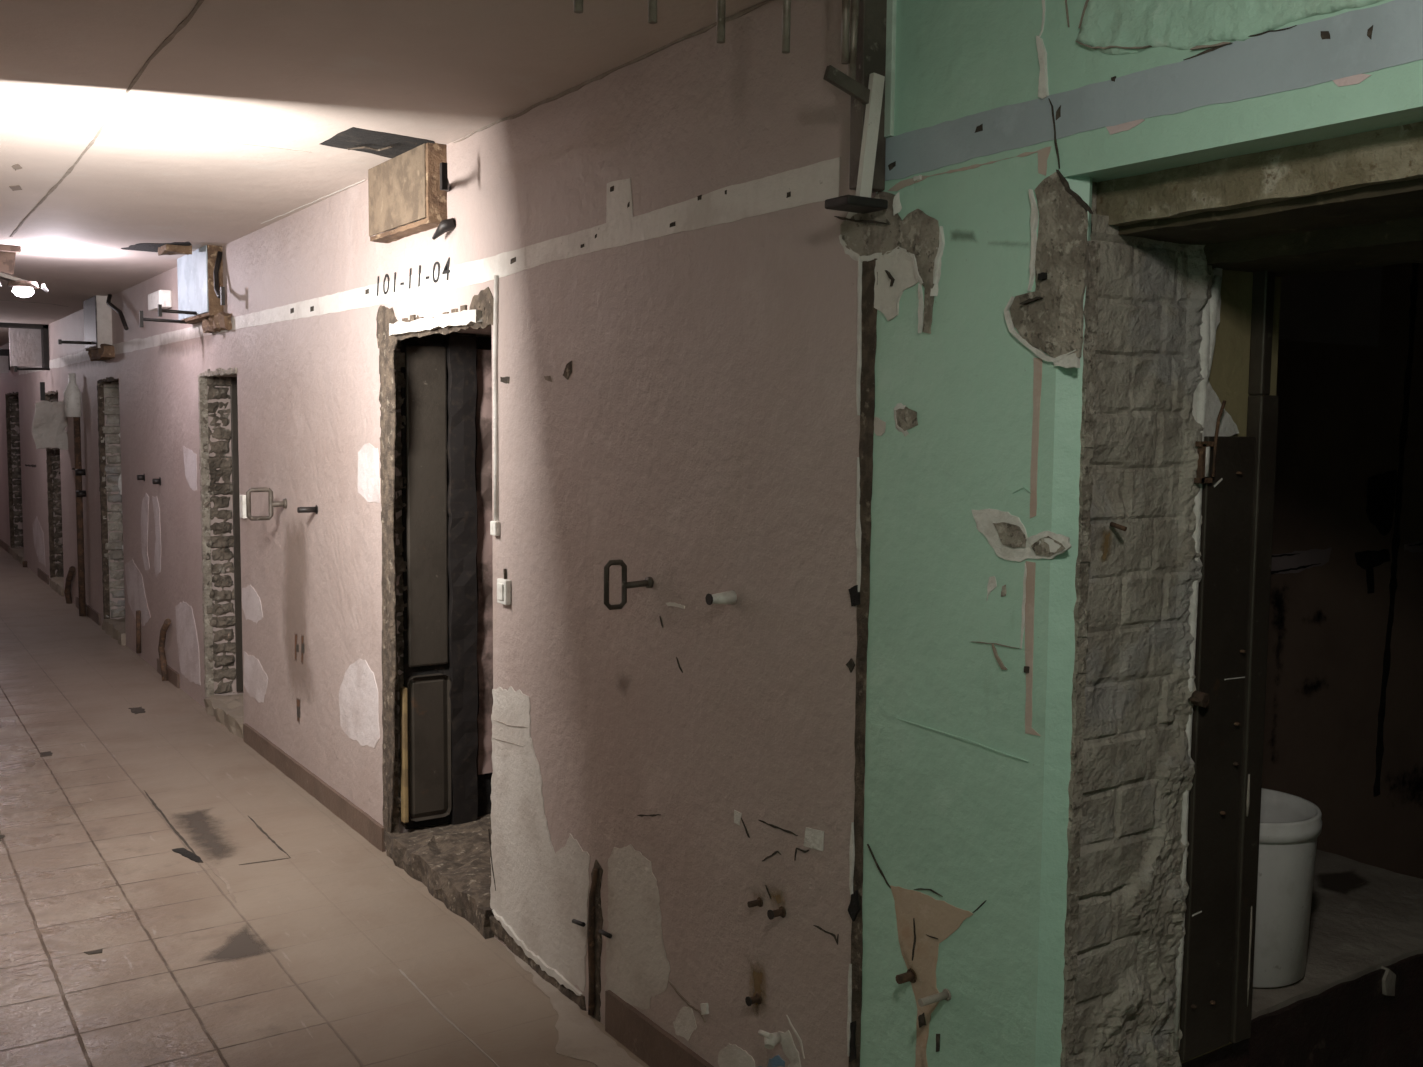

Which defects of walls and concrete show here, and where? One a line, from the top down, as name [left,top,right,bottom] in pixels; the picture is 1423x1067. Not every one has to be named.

flaking render [834,146,1239,1067]
peeling [488,686,590,1011]
peeling [605,844,709,1041]
peeling [718,1015,805,1067]